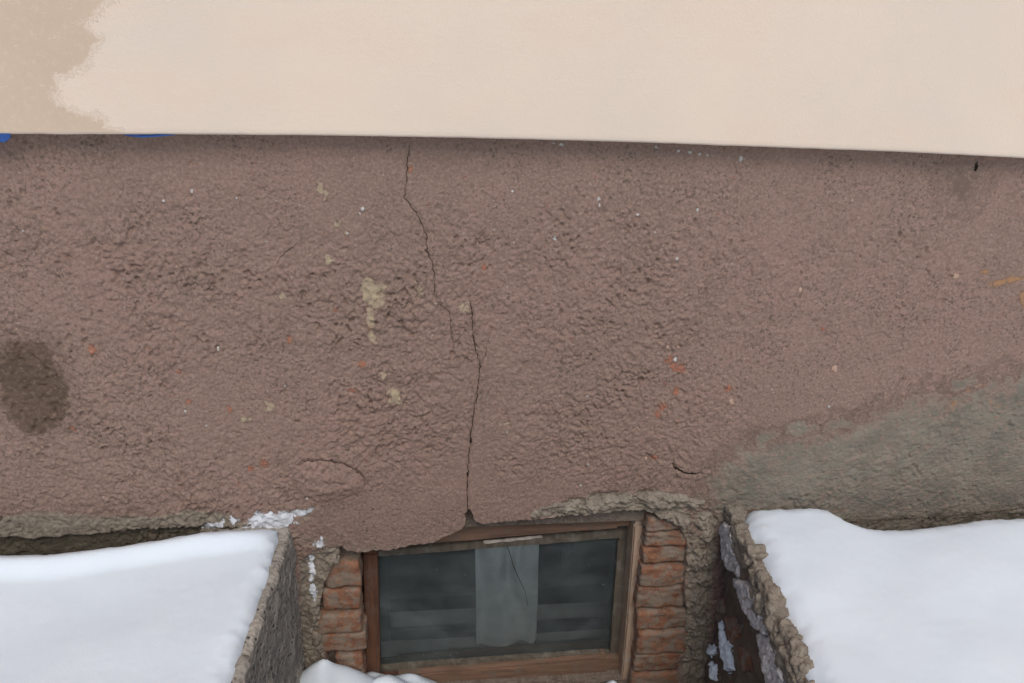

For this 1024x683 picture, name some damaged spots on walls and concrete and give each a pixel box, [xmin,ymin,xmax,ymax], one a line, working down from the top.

water stain [0,325,83,445]
crack [404,154,489,510]
flaking render [530,346,1024,683]
water stain [846,504,1024,531]